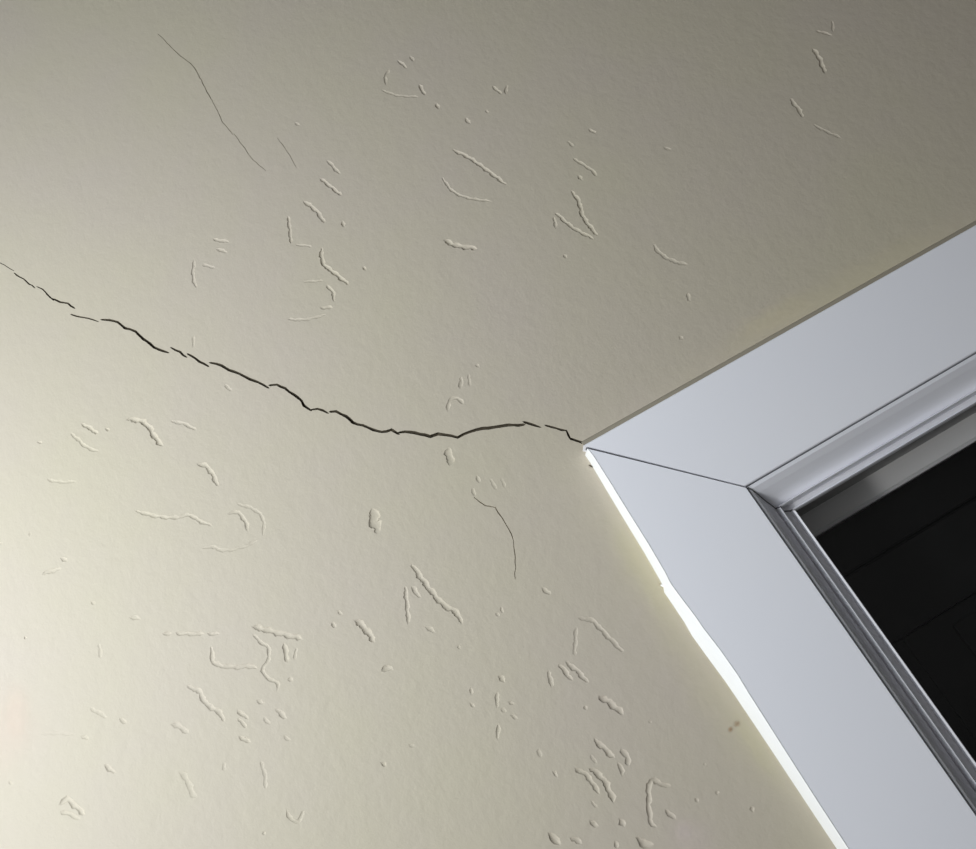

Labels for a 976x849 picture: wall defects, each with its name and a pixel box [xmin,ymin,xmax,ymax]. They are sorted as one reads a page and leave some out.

crack [0,263,793,512]